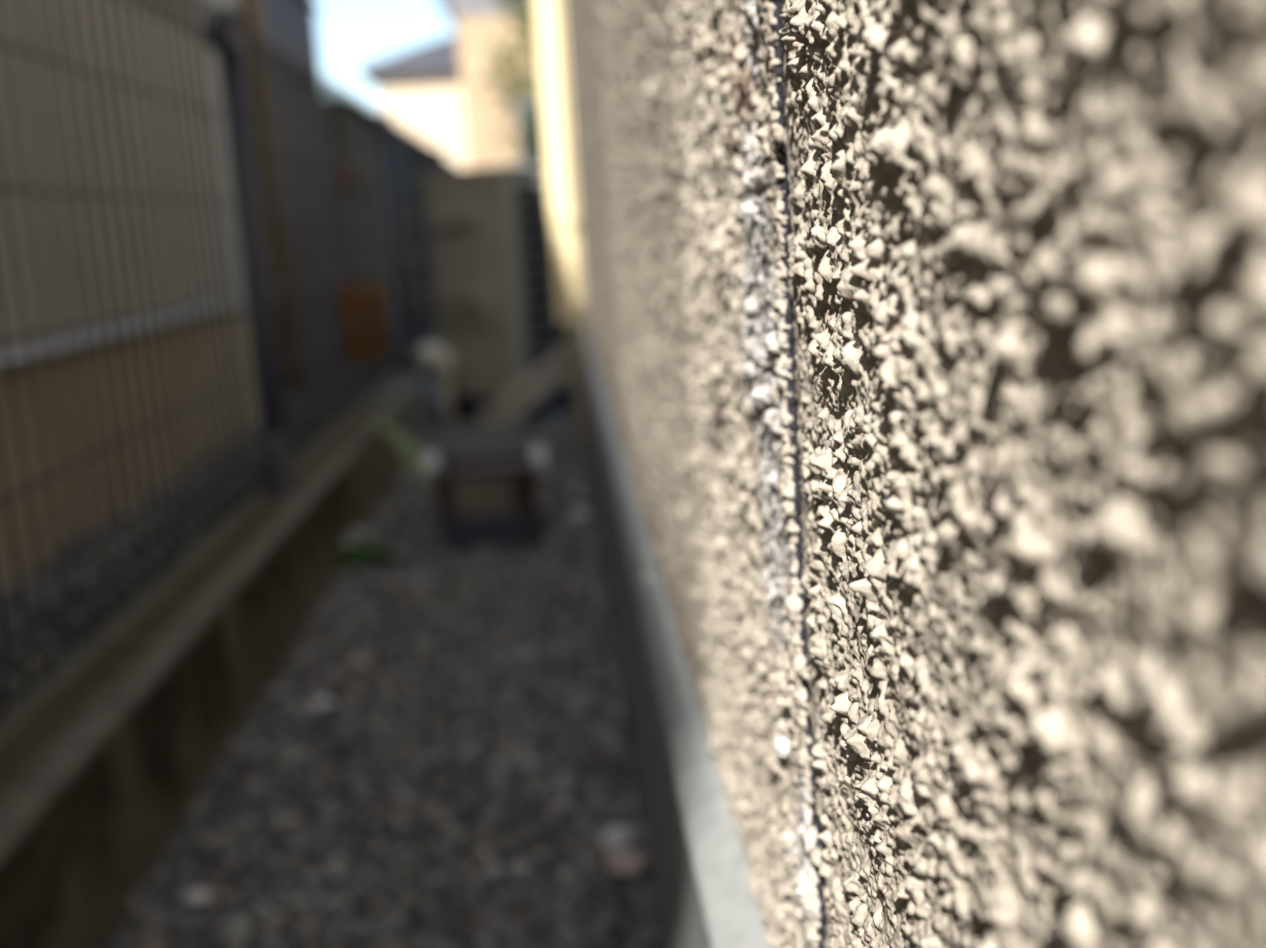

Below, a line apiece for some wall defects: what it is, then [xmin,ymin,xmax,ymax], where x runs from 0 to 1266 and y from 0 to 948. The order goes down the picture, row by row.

crack [766,0,827,948]